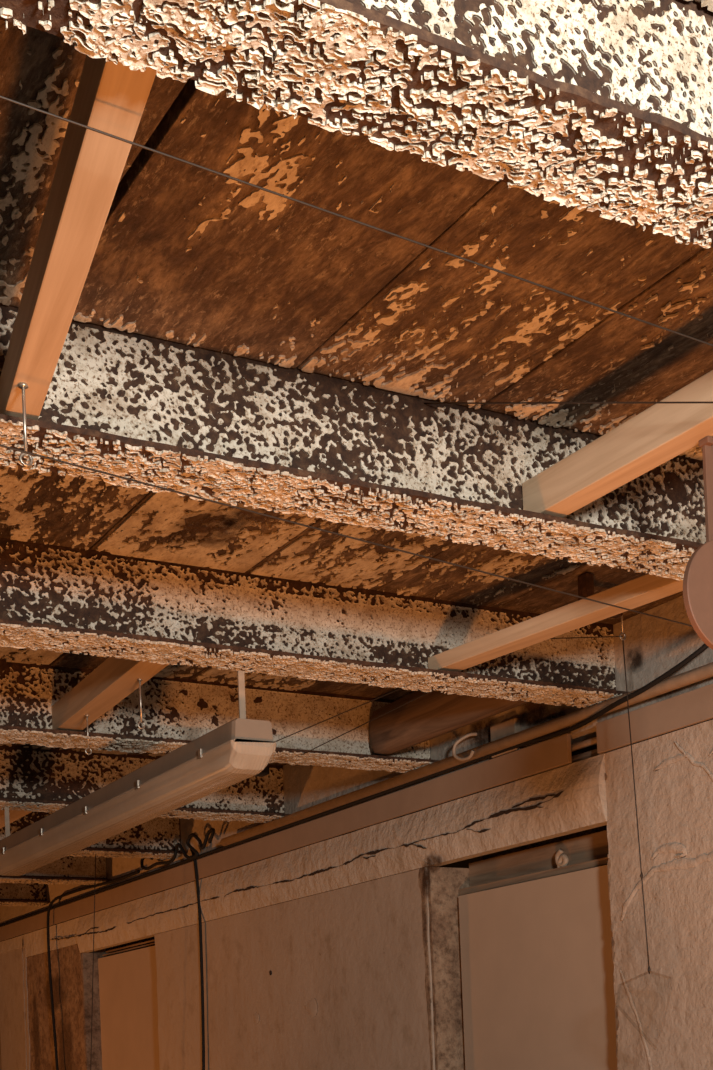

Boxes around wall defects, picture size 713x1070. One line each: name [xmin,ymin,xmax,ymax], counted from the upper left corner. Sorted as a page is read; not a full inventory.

peeling [0,0,713,351]
leakage [180,508,268,544]
peeling [0,201,706,907]
crack [50,790,565,940]
leakage [422,857,441,895]